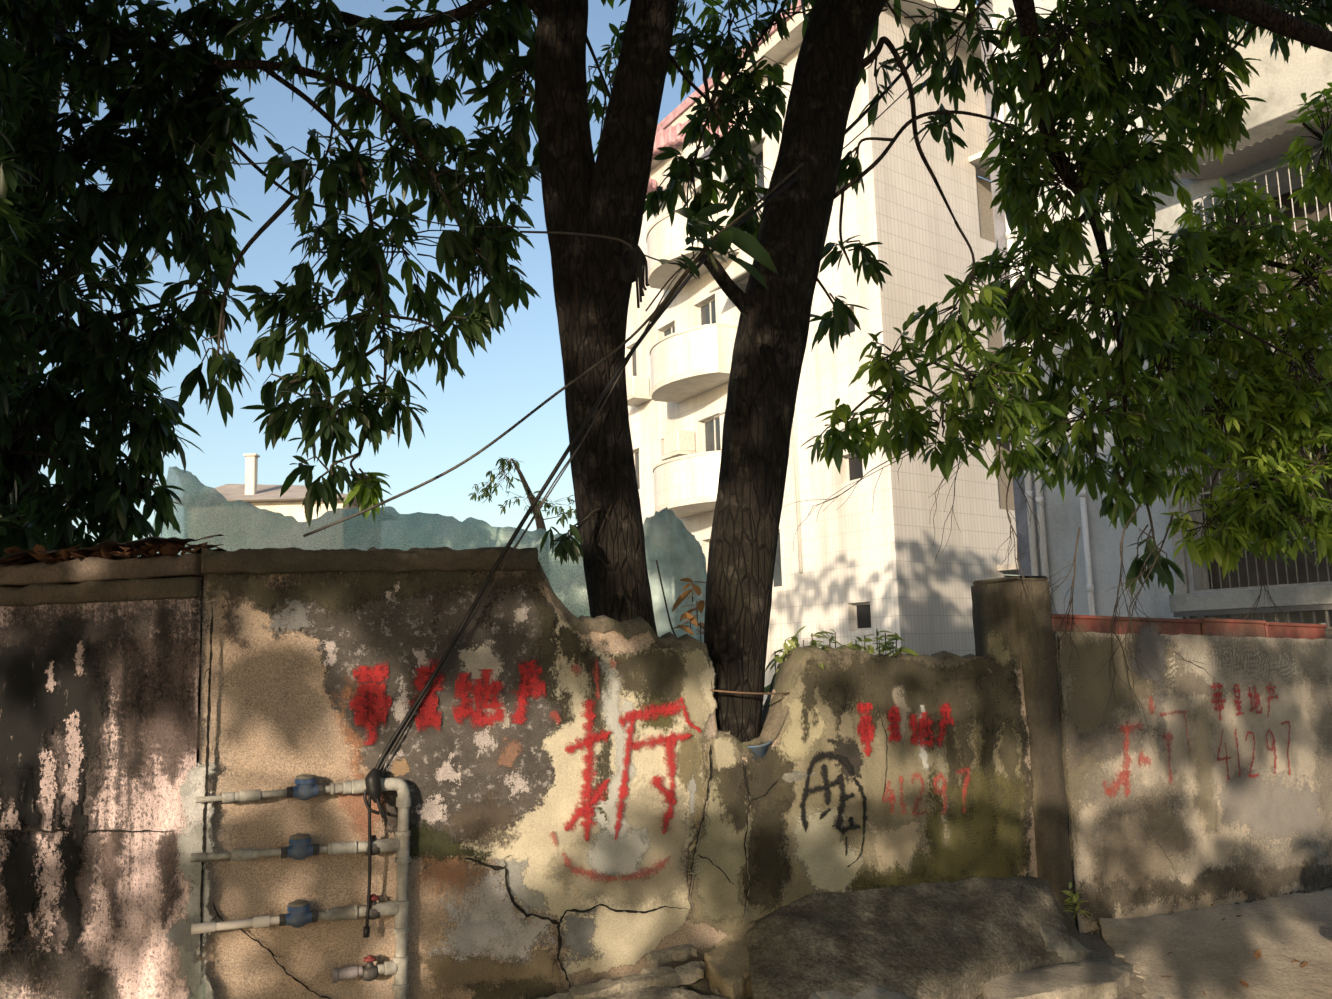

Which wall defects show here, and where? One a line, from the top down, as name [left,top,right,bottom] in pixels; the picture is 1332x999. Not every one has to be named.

crack [0,605,331,999]
spalling [379,749,410,778]
water stain [0,562,797,999]
crack [464,745,778,987]
water stain [846,862,970,892]
water stain [800,650,1034,876]